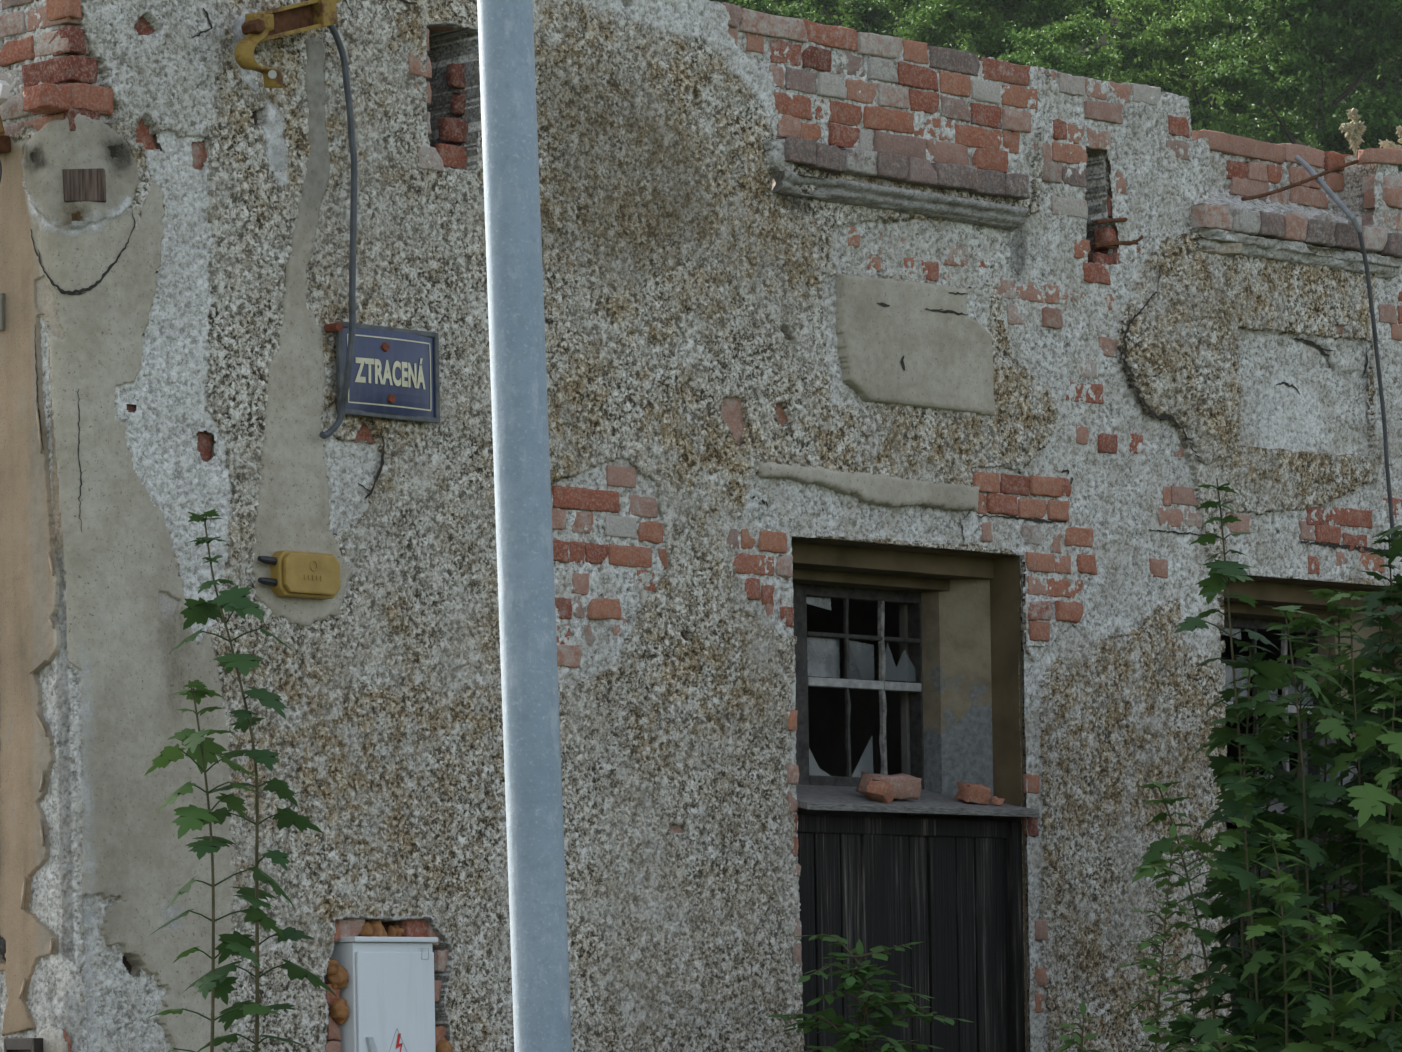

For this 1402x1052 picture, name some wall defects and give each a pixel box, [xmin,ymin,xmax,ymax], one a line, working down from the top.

spalling [0,0,114,135]
spalling [134,16,154,35]
peeling [0,277,173,1052]
spalling [551,457,668,686]
spalling [721,3,1402,1052]